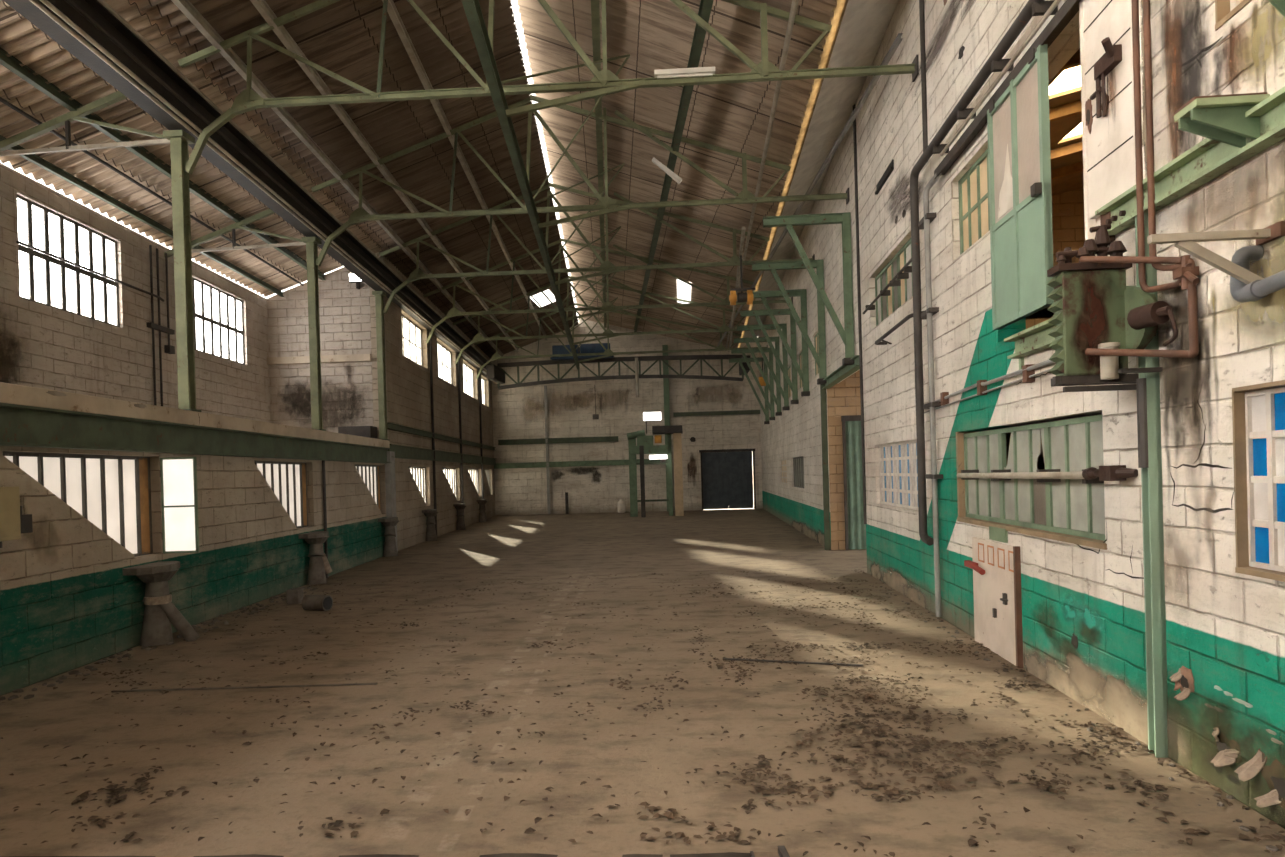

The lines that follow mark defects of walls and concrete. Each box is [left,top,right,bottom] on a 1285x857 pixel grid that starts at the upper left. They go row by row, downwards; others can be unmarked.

damp [1162,2,1222,152]
corrosion [1073,274,1108,367]
crack [1170,389,1234,513]
peeling [1025,596,1148,745]
spalling [1170,666,1194,701]
peeling [1205,685,1253,709]
spalling [1210,727,1285,808]